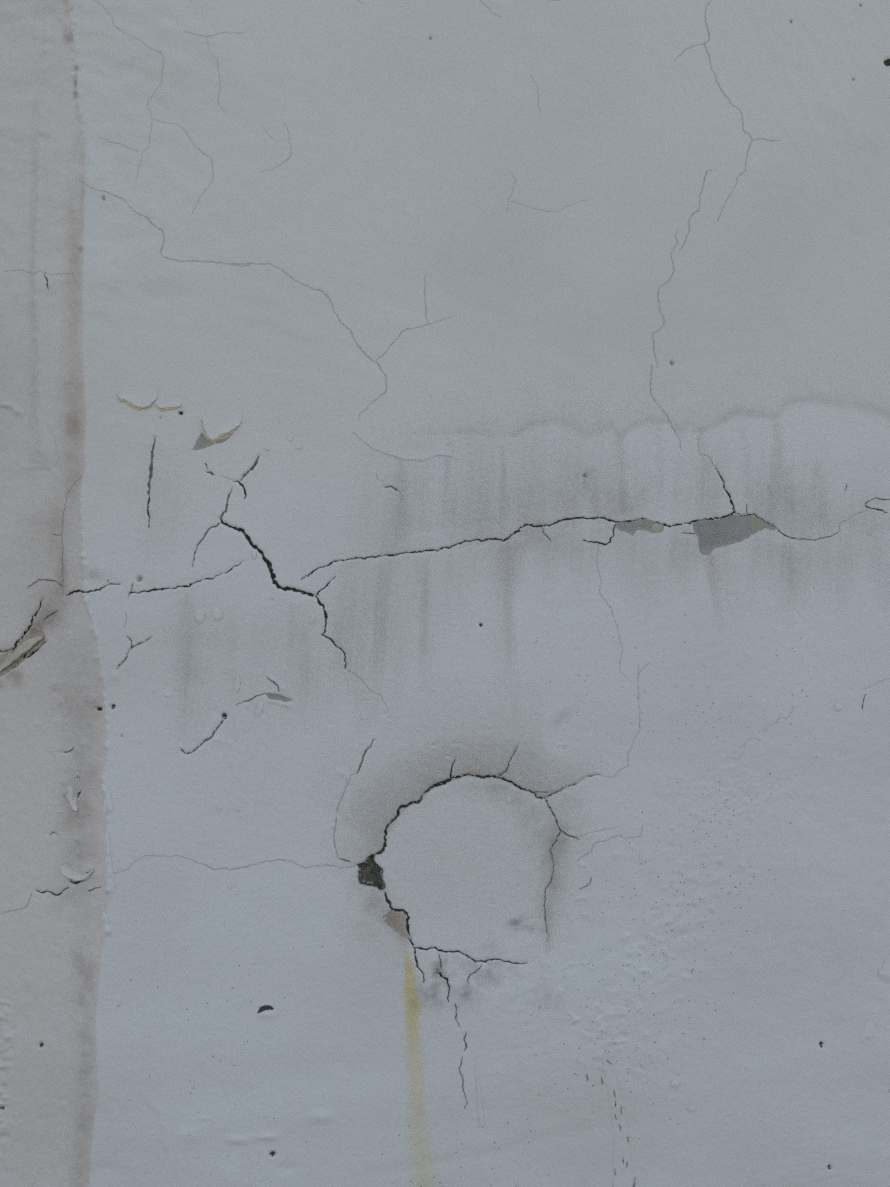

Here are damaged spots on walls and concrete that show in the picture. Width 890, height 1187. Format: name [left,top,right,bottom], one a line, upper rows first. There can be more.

peeling [192,391,243,450]
crack [0,0,890,932]
spalling [616,519,664,535]
spalling [692,515,775,555]
spalling [0,627,45,677]
spalling [358,854,385,890]
crack [383,892,525,1109]